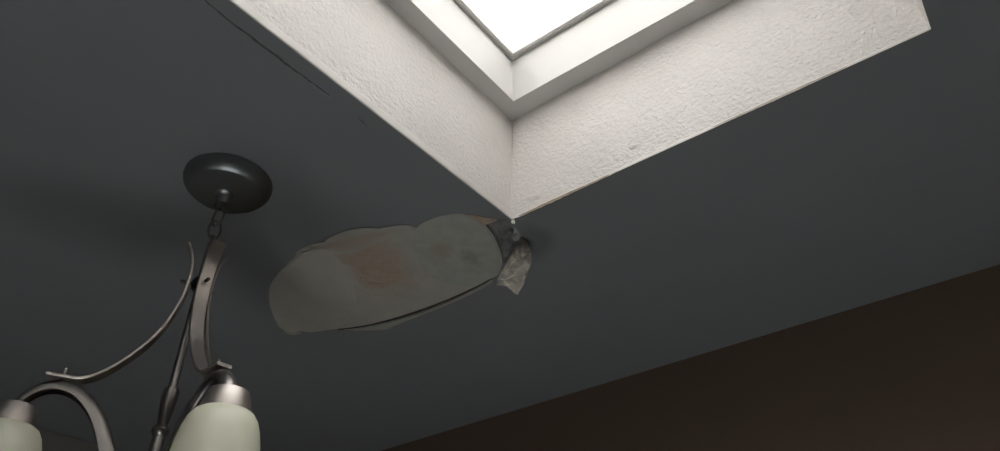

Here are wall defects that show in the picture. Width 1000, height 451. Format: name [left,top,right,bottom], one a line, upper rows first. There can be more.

crack [205,0,331,98]
peeling [269,214,532,335]